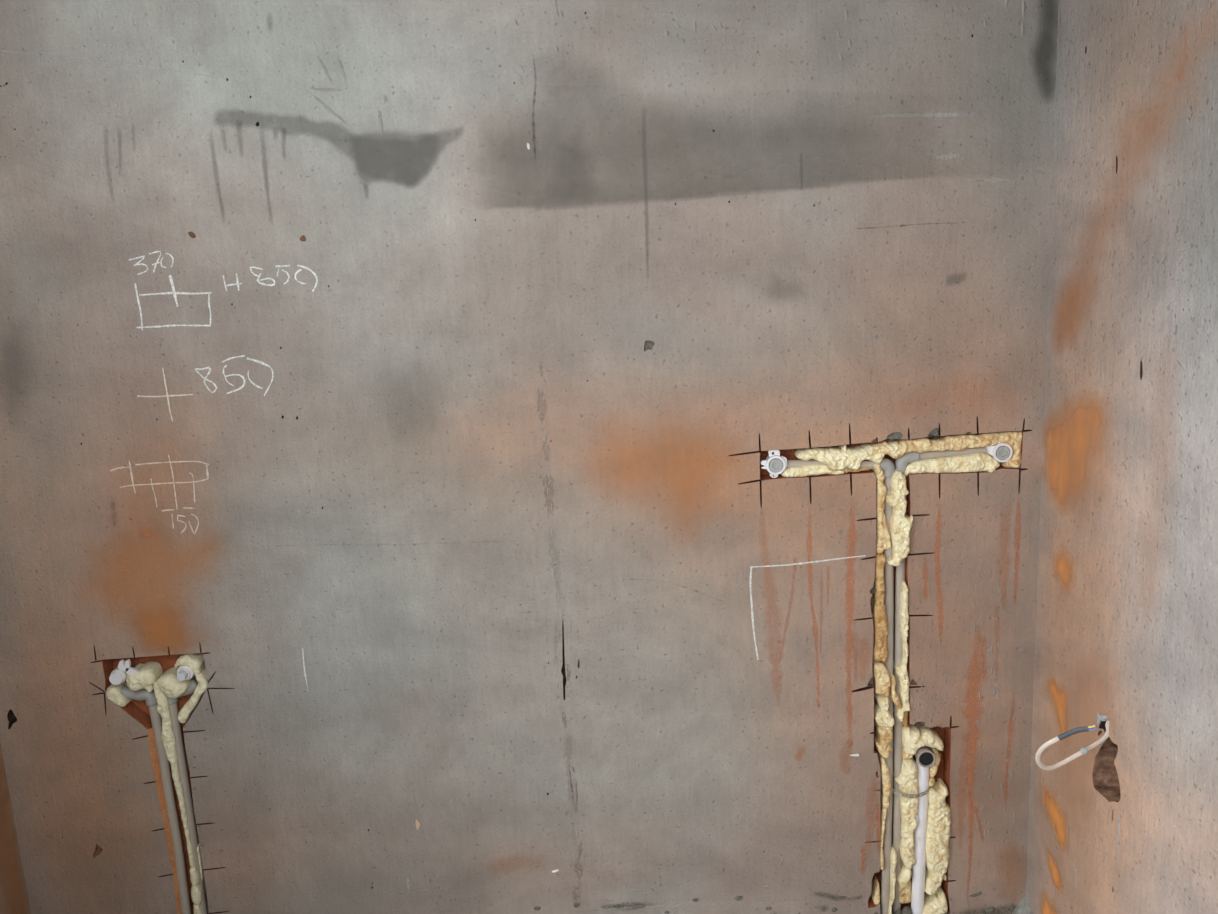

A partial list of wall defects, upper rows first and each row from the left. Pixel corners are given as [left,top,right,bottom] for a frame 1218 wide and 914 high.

water stain [1037,0,1054,90]
crack [538,365,585,904]